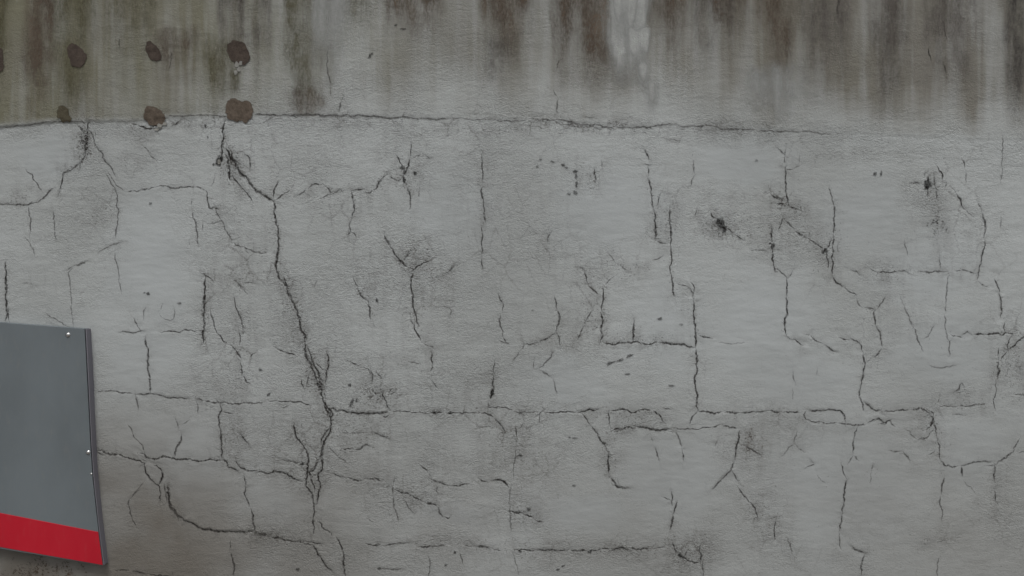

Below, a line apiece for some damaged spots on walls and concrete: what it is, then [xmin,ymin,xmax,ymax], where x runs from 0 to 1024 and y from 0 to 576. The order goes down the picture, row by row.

water stain [608,0,657,102]
crack [2,114,1024,575]